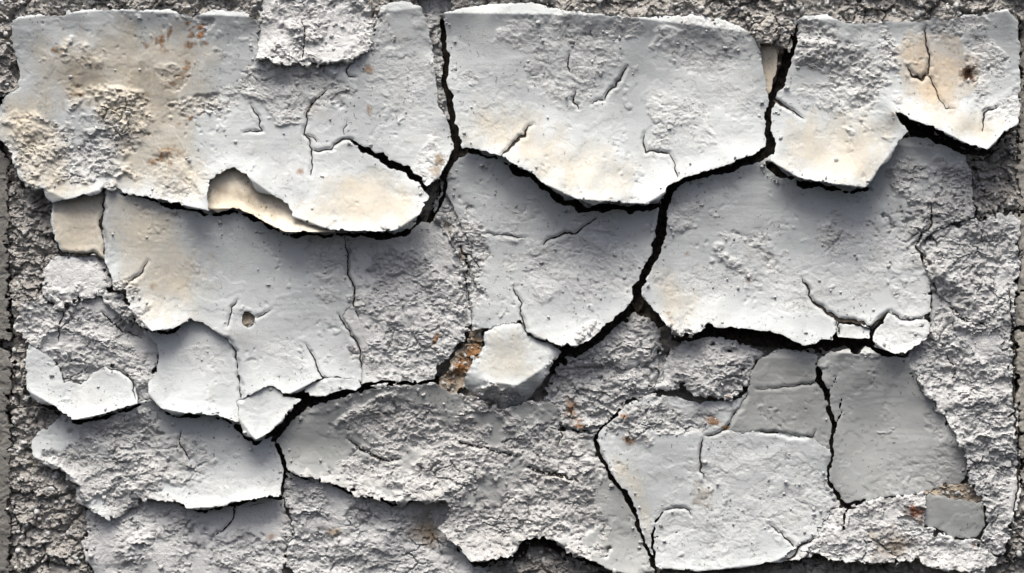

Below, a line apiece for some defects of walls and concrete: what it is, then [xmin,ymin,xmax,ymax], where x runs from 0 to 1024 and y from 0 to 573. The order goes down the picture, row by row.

crack [896,28,1015,161]
peeling [0,0,472,573]
crack [60,19,923,535]
peeling [276,0,1024,573]
crack [915,205,984,325]
crack [41,367,141,425]
rust [449,343,481,375]
crack [452,536,605,573]
crack [557,403,691,573]
crack [769,524,814,560]